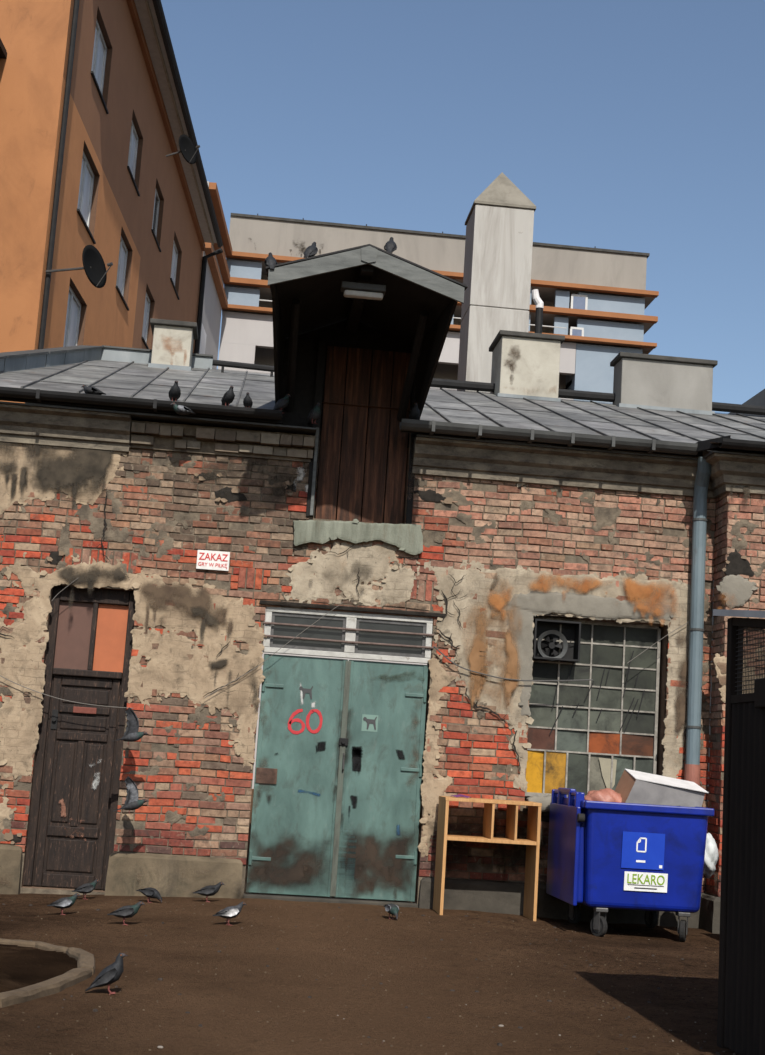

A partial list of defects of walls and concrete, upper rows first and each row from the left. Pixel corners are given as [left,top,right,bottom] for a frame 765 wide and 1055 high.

water stain [0,441,112,503]
water stain [141,583,233,638]
corrosion [489,576,510,618]
corrosion [531,575,602,592]
corrosion [625,579,676,623]
spalling [722,549,754,577]
peeling [0,443,691,857]
corrosion [469,614,488,705]
corrosion [504,632,518,696]
flaking render [700,653,727,866]
corrosion [247,838,323,888]
corrosion [338,835,413,893]